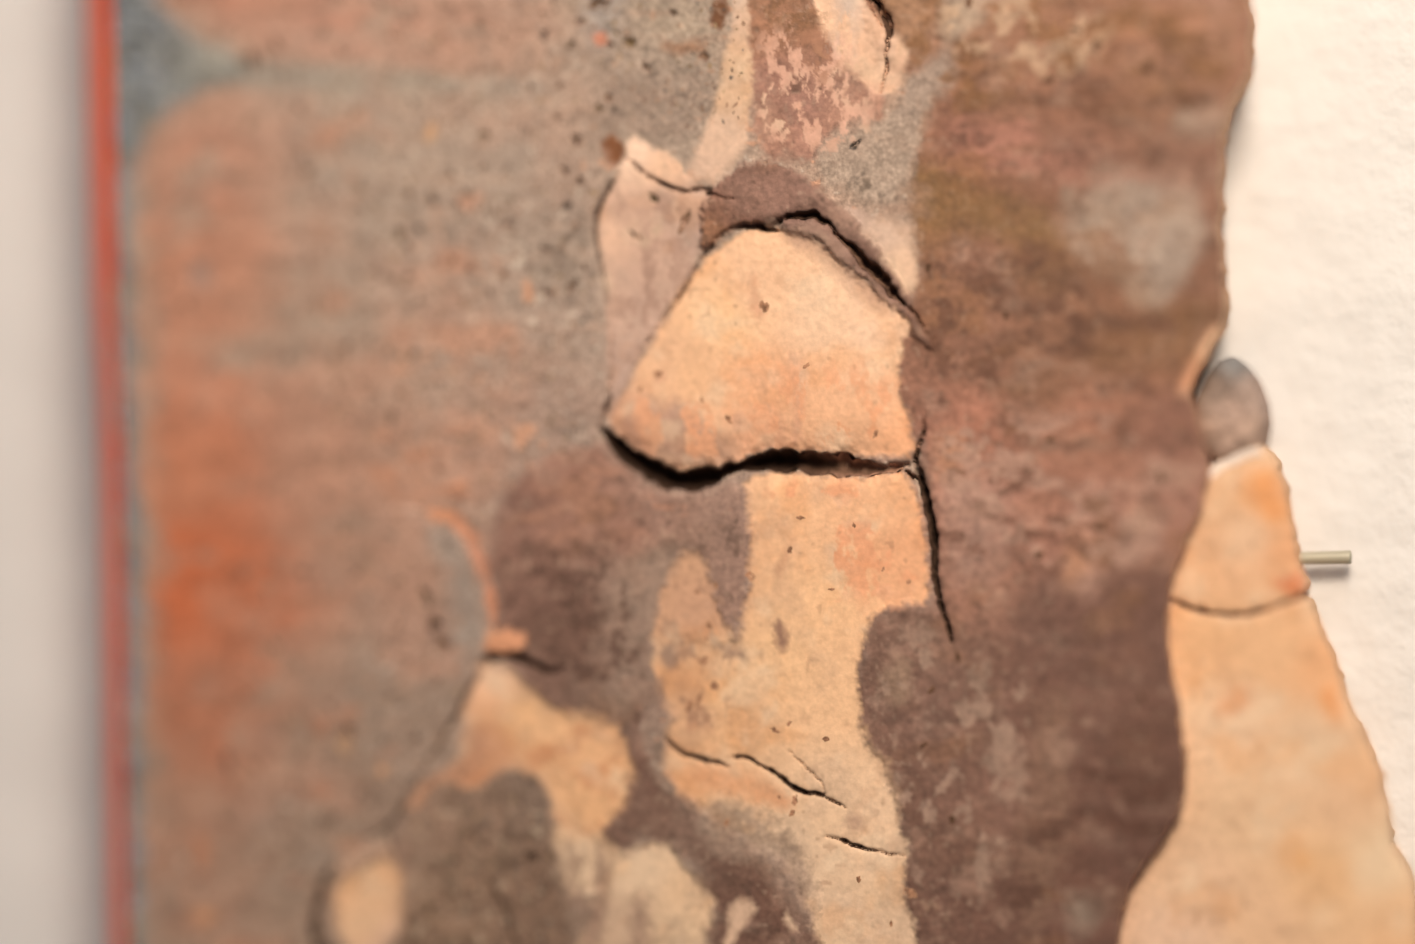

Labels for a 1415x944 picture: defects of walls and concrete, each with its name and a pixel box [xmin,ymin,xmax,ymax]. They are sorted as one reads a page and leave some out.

damp [576,0,719,151]
crack [870,0,894,93]
damp [392,183,826,944]
spalling [543,0,933,944]
crack [551,164,953,643]
damp [750,0,1254,944]
crack [1171,594,1303,617]
crack [367,653,562,860]
spalling [404,510,761,944]
crack [666,739,903,856]
crack [309,867,334,944]